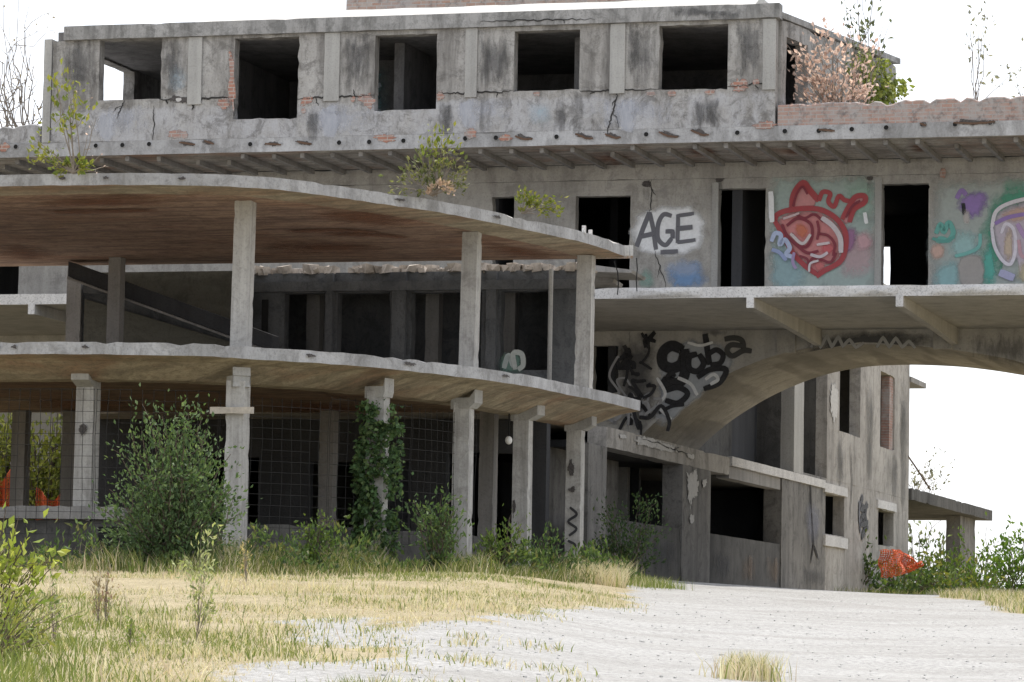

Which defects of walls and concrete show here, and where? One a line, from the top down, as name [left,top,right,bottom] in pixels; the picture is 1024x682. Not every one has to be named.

peeling [204,50,236,111]
crack [152,96,233,139]
crack [579,89,659,137]
peeling [620,434,707,524]